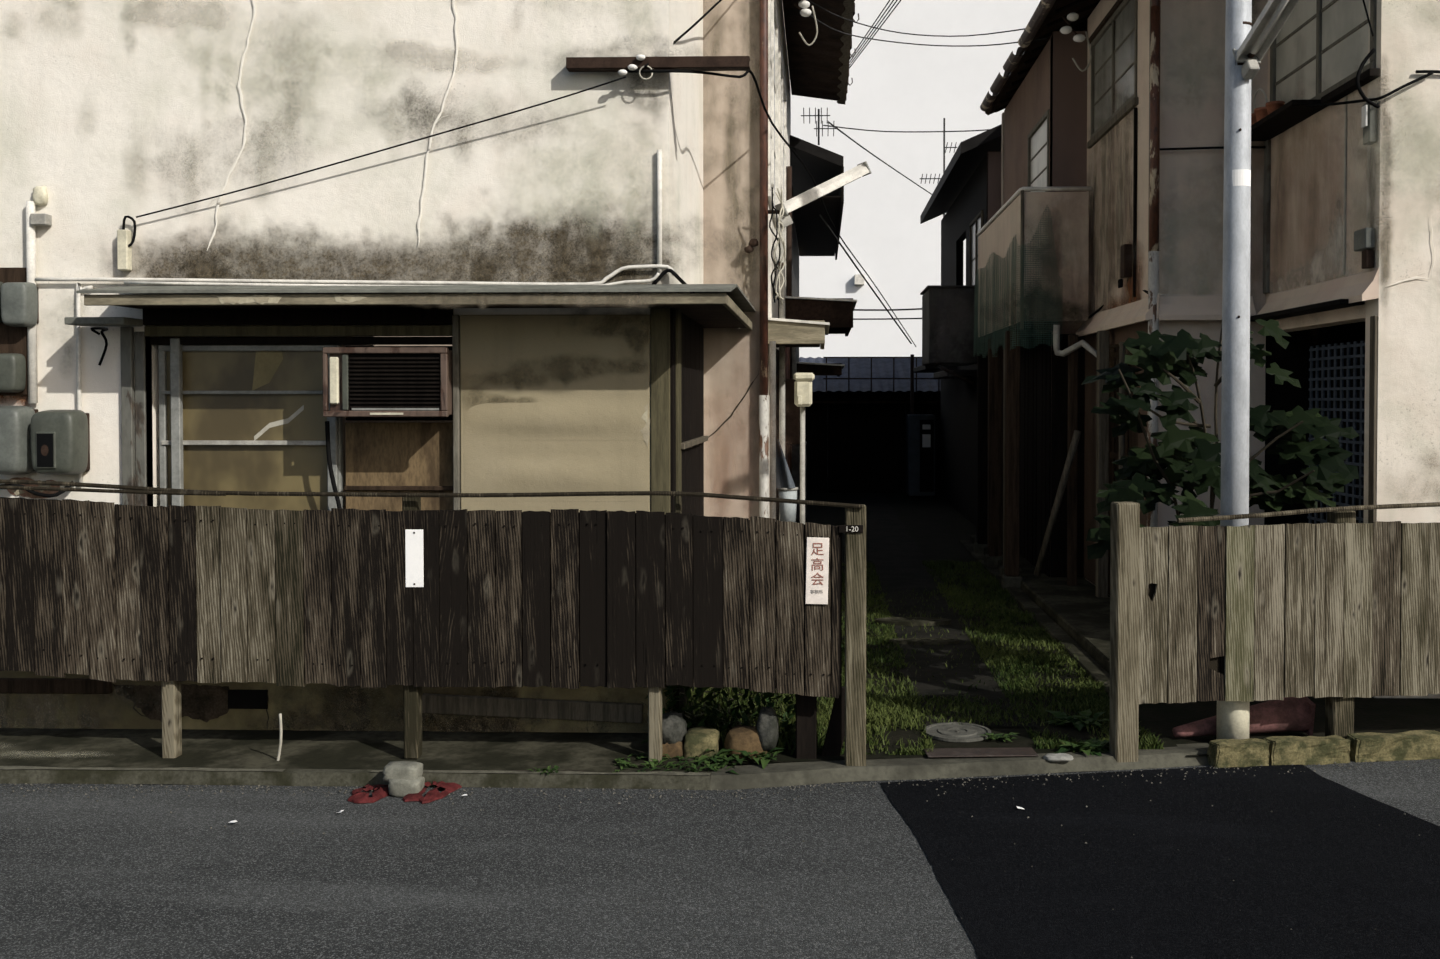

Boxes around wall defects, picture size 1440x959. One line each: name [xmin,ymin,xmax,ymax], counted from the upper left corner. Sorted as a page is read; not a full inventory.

crack [207,0,256,250]
leakage [132,213,680,294]
crack [417,0,458,246]
leakage [1006,95,1133,326]
rust [1110,247,1140,309]
leakage [1369,82,1391,282]